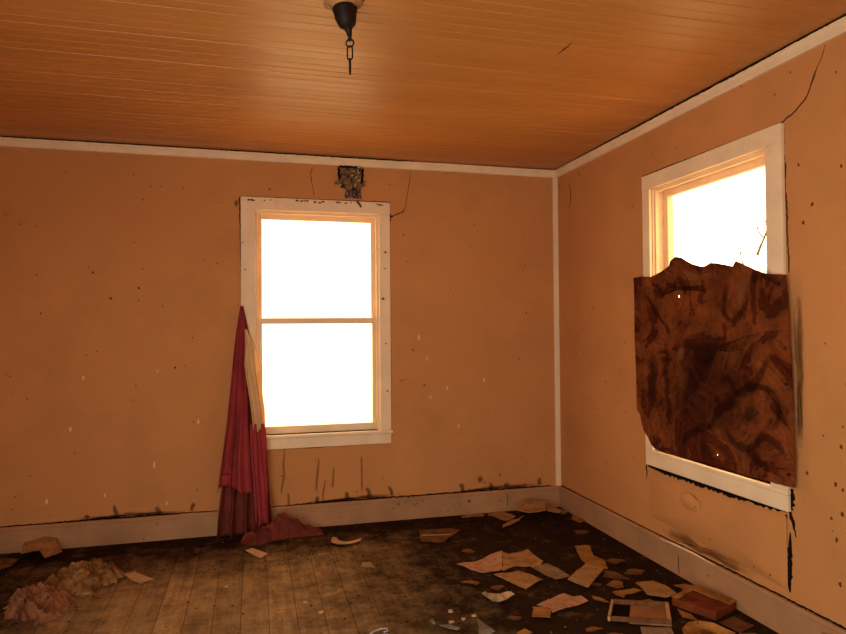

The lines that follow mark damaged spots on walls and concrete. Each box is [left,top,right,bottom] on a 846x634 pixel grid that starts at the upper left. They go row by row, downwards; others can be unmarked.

crack [239,166,411,271]
spalling [334,165,366,190]
crack [642,137,743,177]
crack [777,44,826,272]
crack [271,465,846,630]